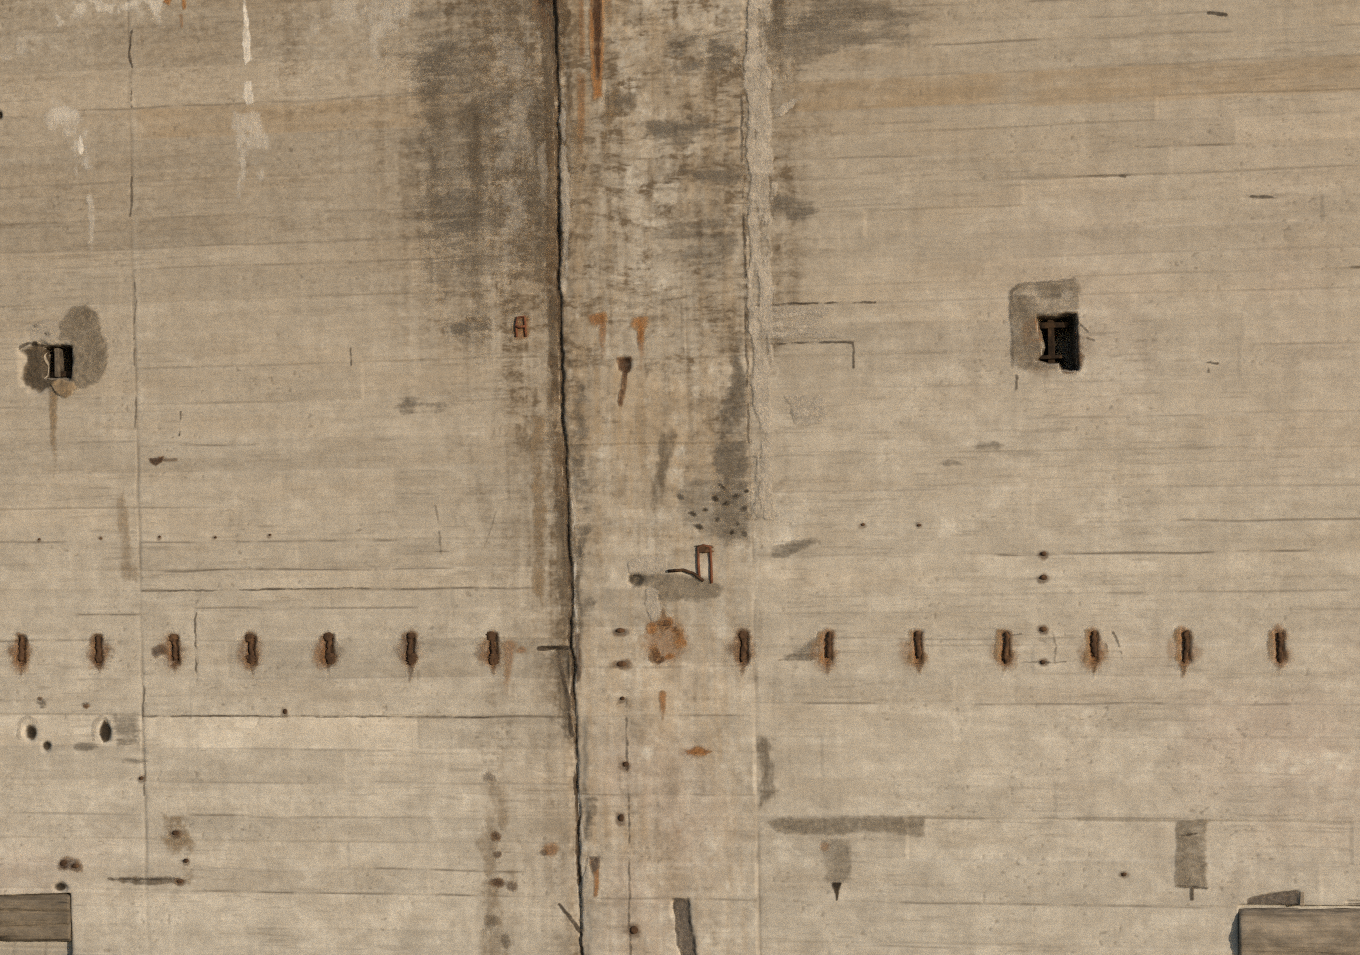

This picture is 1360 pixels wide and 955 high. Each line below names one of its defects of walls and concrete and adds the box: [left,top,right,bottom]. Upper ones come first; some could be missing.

rust [578,0,605,126]
water stain [647,114,738,144]
crack [539,0,569,491]
spalling [19,319,76,397]
water stain [713,356,749,484]
rust [12,633,28,671]
rust [90,633,104,667]
rust [152,634,180,668]
rust [244,631,259,668]
rust [646,610,687,664]
rust [1174,627,1193,675]
crack [537,524,583,955]